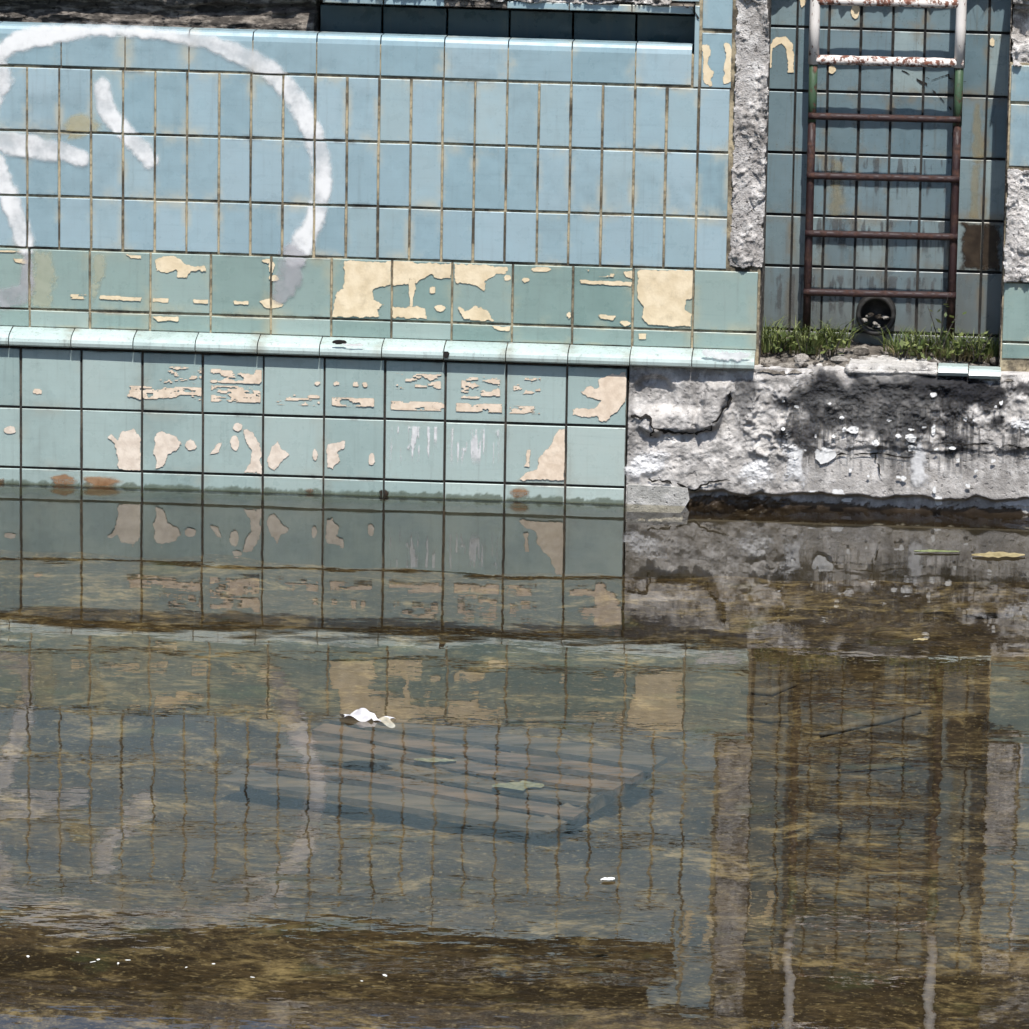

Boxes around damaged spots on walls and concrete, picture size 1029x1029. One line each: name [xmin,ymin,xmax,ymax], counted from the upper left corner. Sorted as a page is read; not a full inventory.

spalling [702,0,794,269]
spalling [1003,168,1029,283]
peeling [332,260,551,331]
peeling [580,269,693,339]
peeling [127,366,262,403]
peeling [573,372,629,422]
crack [631,391,732,436]
peeling [108,428,197,471]
peeling [518,429,565,481]
damp [625,451,670,476]
crack [648,478,731,491]
damp [681,368,1029,529]